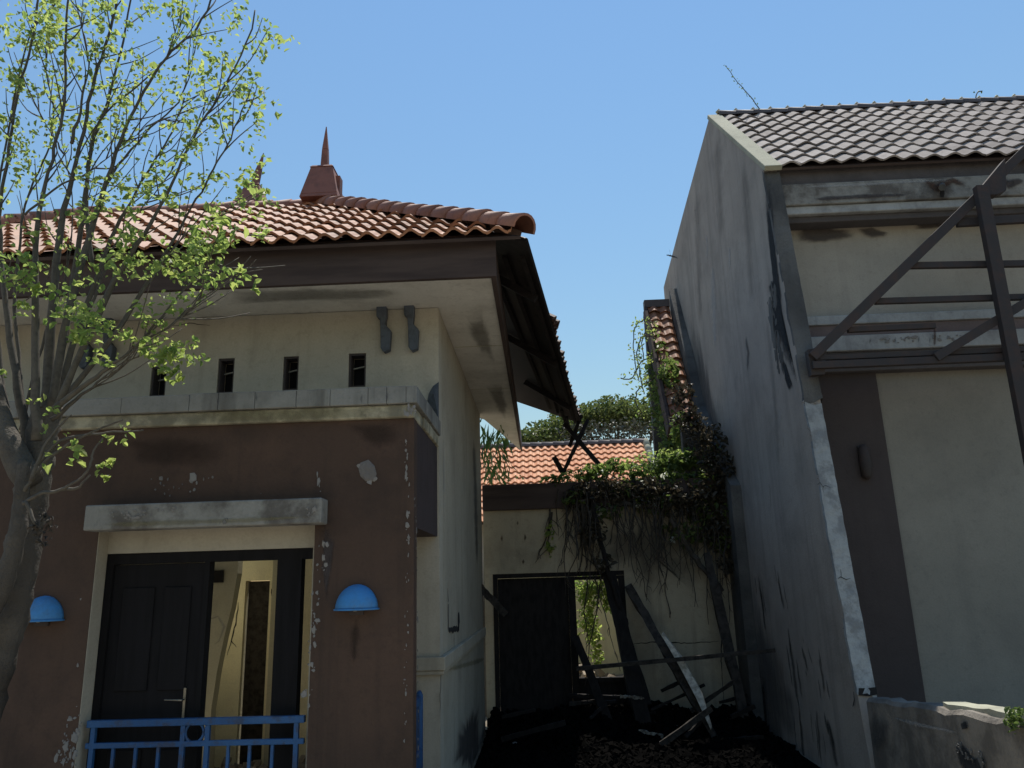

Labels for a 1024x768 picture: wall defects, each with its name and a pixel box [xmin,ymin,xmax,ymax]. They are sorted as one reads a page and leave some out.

damp [767,198,793,389]
spalling [357,460,377,485]
peeling [404,439,418,558]
peeling [307,541,329,672]
peeling [54,706,82,767]